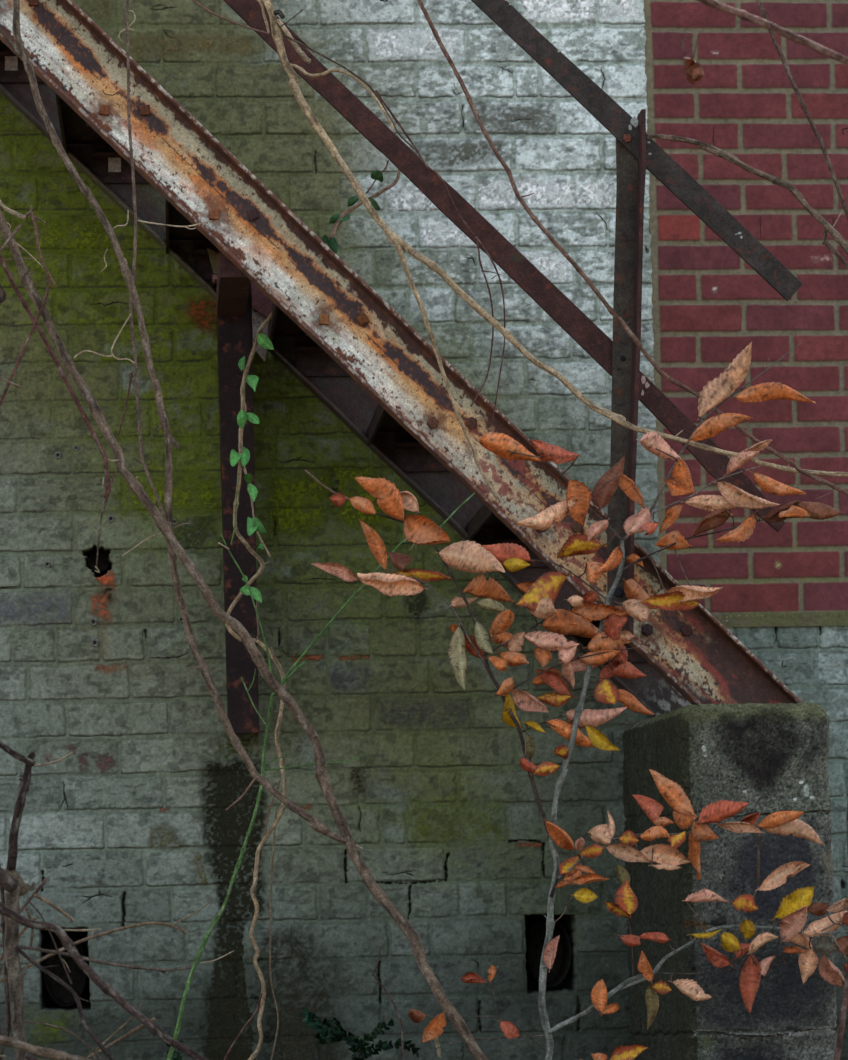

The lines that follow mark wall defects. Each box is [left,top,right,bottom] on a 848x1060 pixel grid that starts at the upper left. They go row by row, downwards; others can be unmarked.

spalling [87,549,114,584]
damp [723,715,822,787]
damp [196,736,266,1060]
damp [265,936,337,1060]